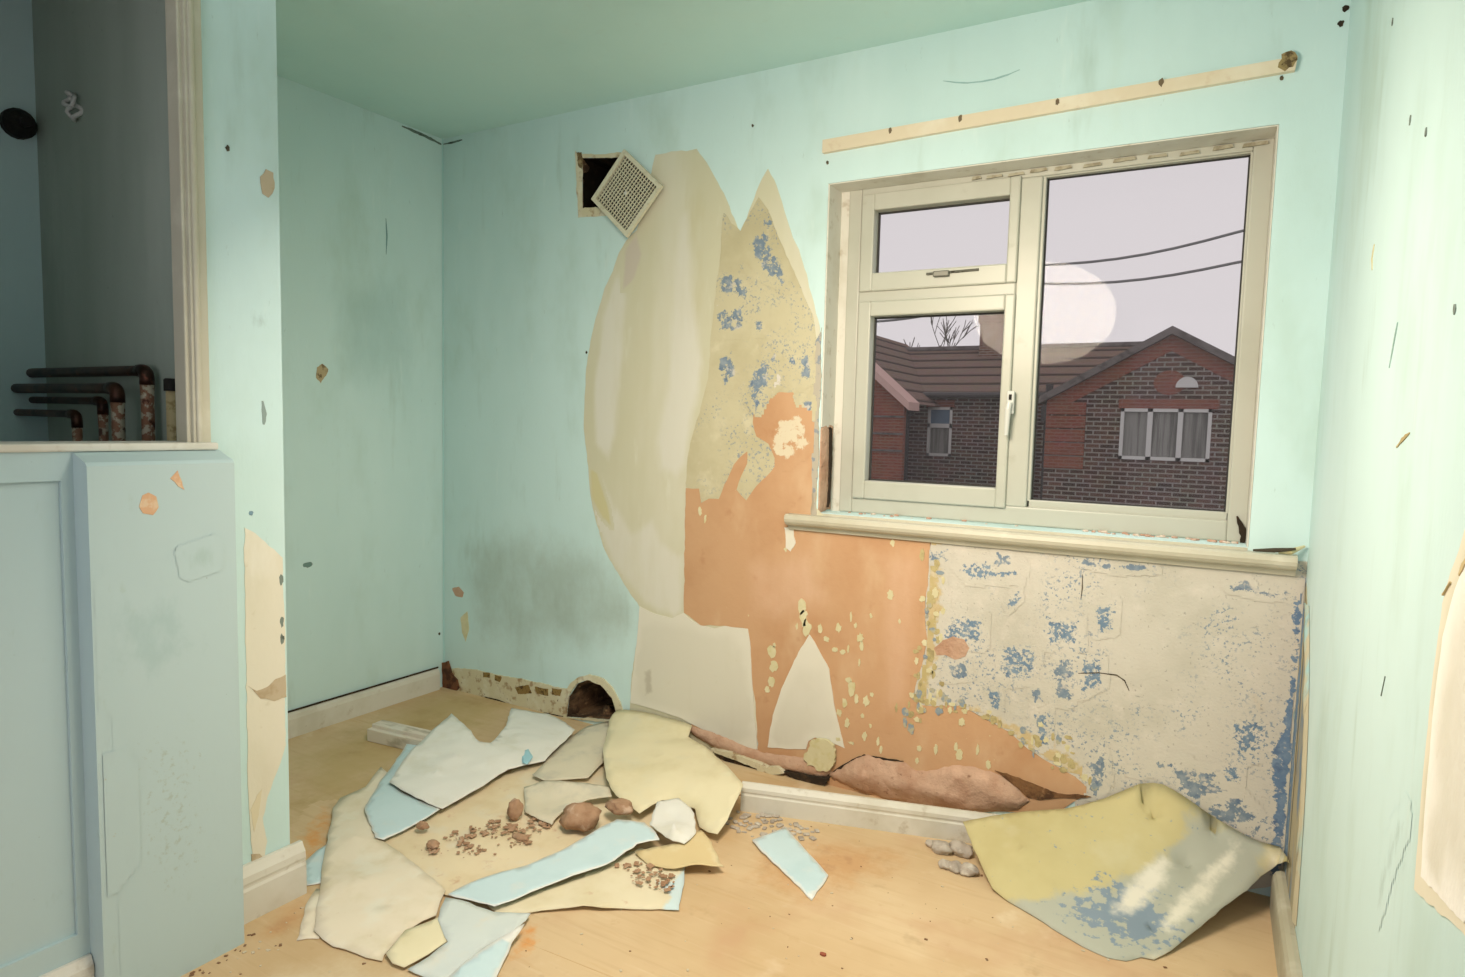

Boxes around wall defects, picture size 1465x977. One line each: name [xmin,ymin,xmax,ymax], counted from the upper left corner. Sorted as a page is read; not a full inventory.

peeling [260,169,275,198]
spalling [575,151,621,218]
peeling [139,493,159,515]
peeling [170,471,184,489]
flaking render [684,197,1310,928]
peeling [243,511,286,861]
peeling [442,661,623,722]